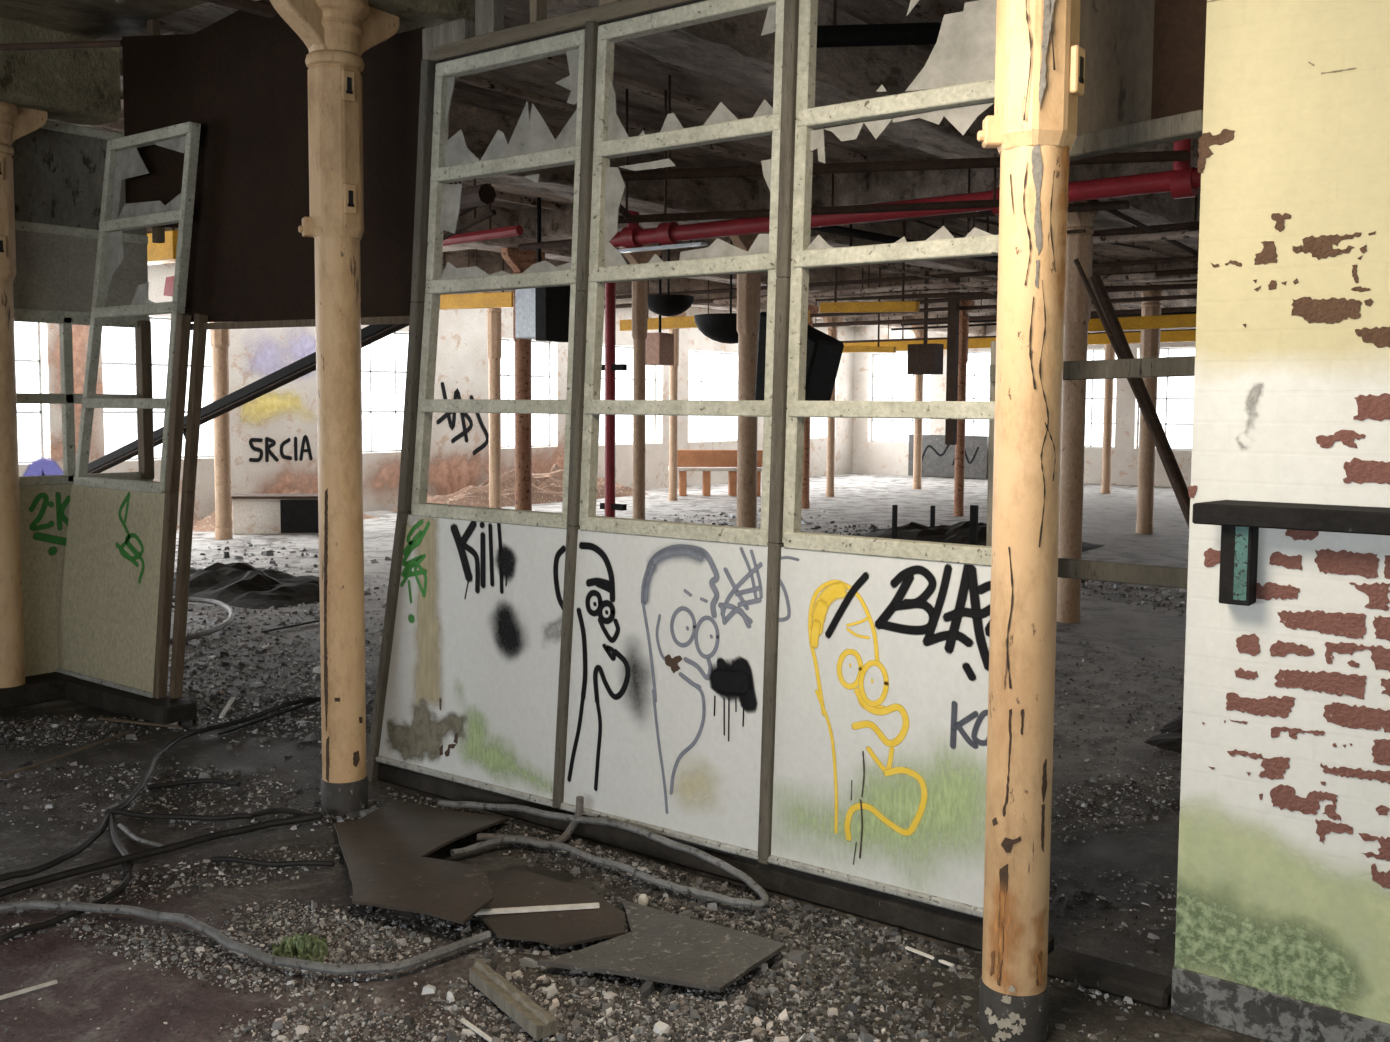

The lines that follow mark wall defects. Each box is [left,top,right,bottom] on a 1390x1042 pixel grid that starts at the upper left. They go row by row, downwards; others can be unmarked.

peeling [1039,0,1055,110]
peeling [1031,145,1043,288]
spalling [1197,129,1234,173]
peeling [1209,213,1390,348]
peeling [1316,393,1390,485]
peeling [1204,548,1220,568]
peeling [1224,529,1390,889]
peeling [985,817,1026,1042]